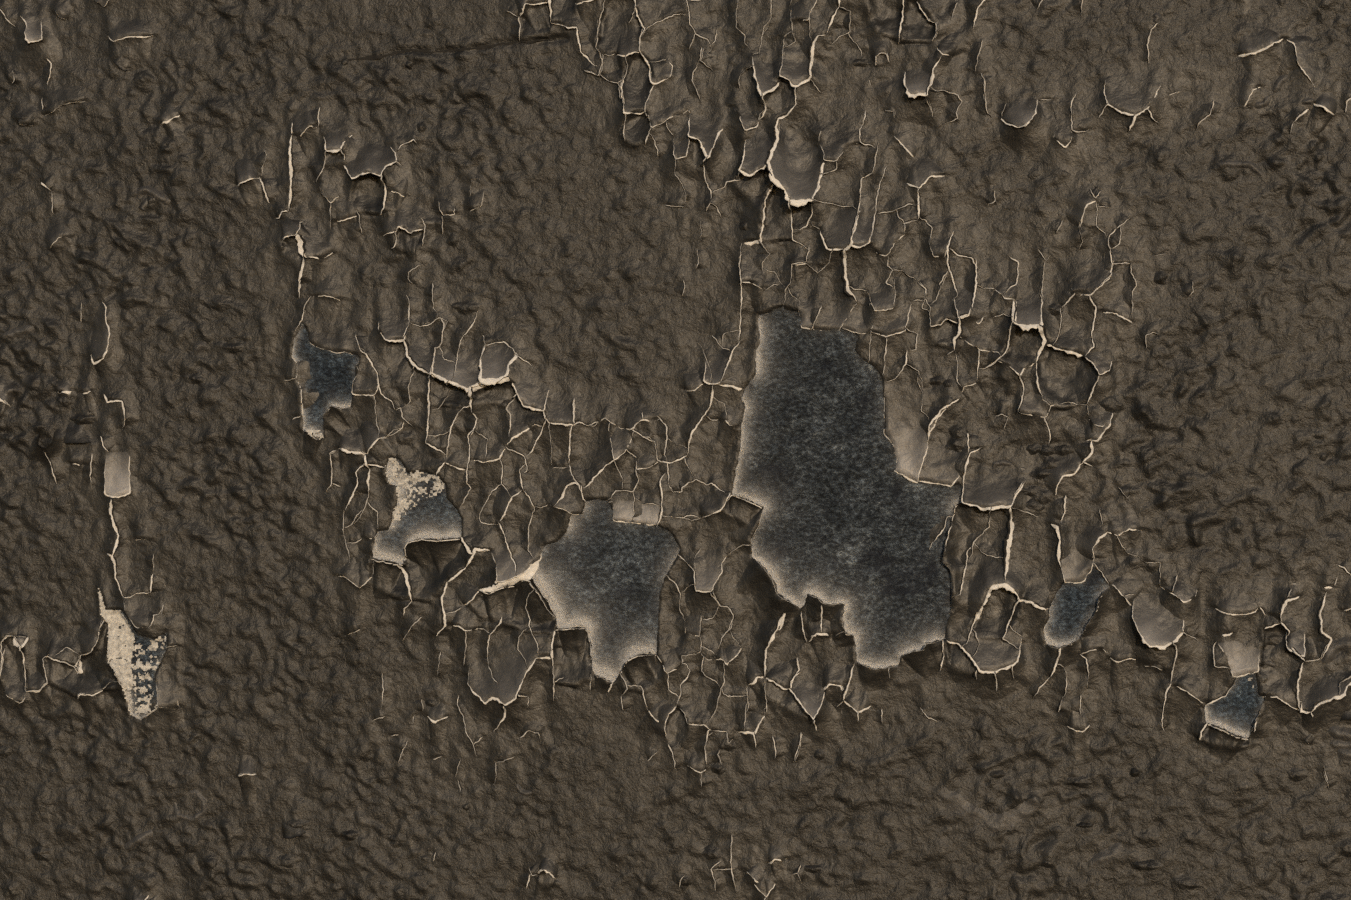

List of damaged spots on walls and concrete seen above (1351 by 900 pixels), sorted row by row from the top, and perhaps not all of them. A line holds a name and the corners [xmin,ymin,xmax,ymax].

crack [336,39,560,70]
crack [682,0,784,71]
crack [948,0,997,112]
crack [1031,0,1083,15]
crack [1137,12,1162,65]
crack [674,240,833,350]
flaking render [233,0,1351,800]
peeling [0,288,185,732]